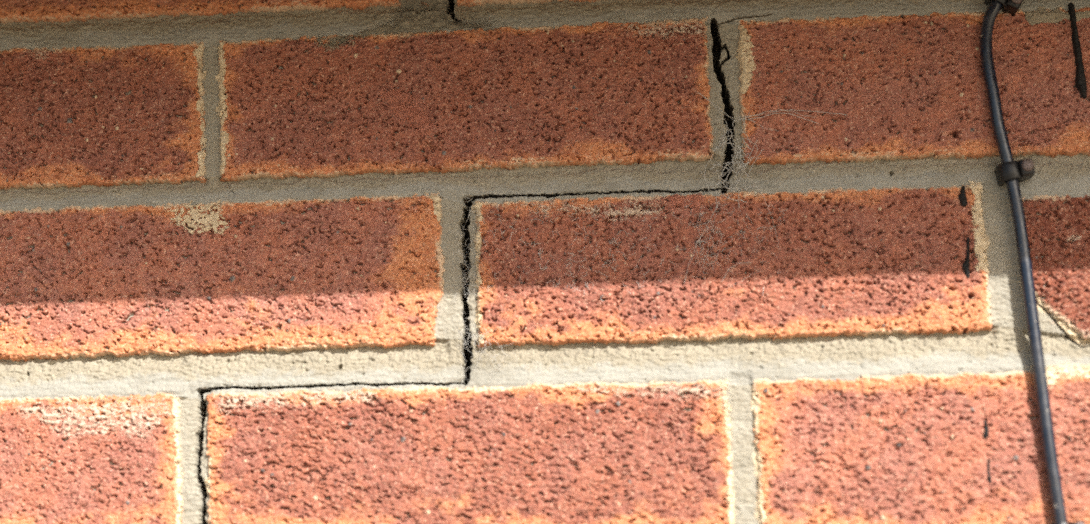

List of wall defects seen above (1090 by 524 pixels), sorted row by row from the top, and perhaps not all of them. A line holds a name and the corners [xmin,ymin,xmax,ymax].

crack [447,0,462,23]
crack [197,14,773,521]
spalling [1036,293,1090,345]